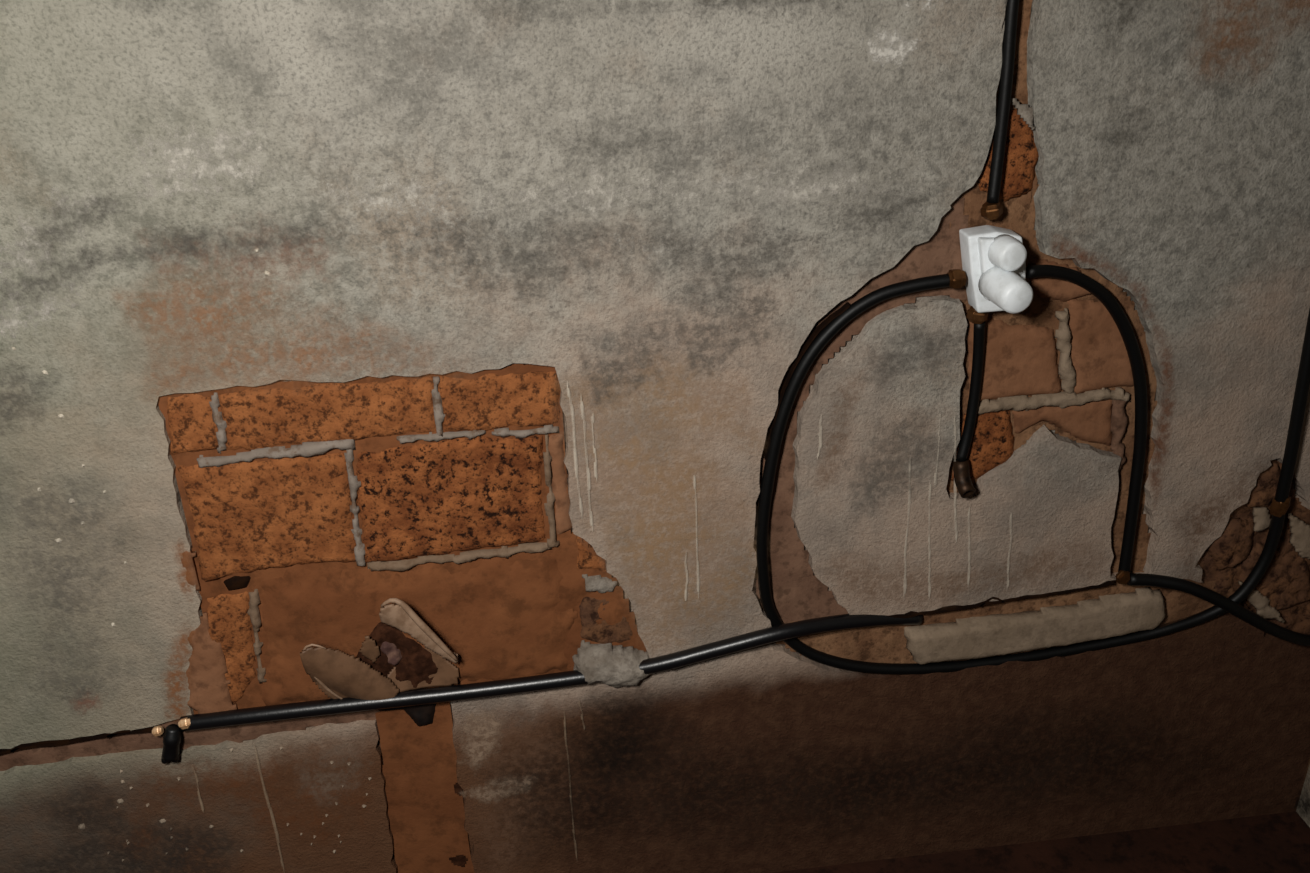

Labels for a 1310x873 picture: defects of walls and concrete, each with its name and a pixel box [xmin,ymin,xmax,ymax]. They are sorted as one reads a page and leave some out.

water stain [868,31,917,65]
peeling [1011,98,1035,130]
water stain [135,129,261,198]
water stain [327,177,473,262]
water stain [508,158,890,220]
flaking render [946,184,1157,573]
flaking render [158,363,647,727]
flaking render [1197,459,1310,634]